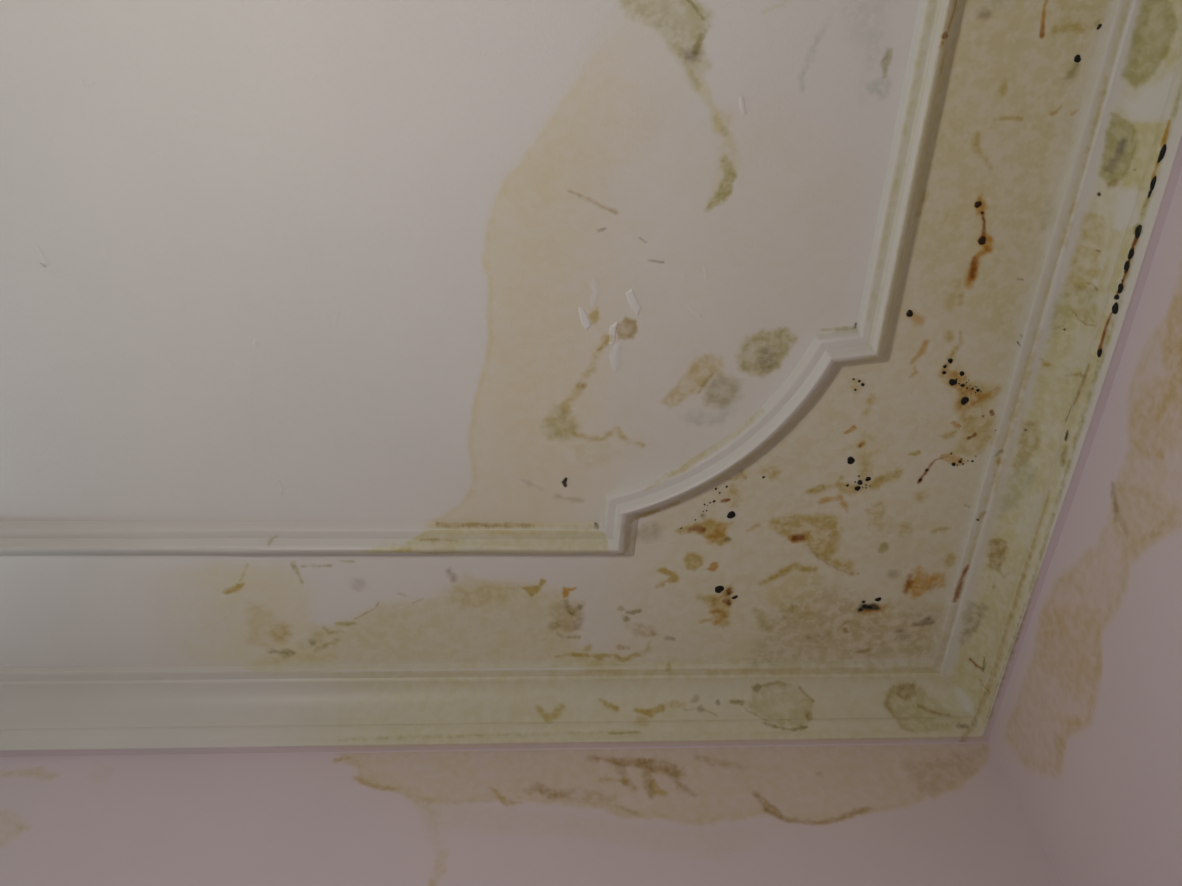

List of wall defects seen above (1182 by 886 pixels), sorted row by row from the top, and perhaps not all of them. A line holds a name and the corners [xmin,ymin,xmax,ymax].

water stain [942,358,982,405]
water stain [846,457,871,491]